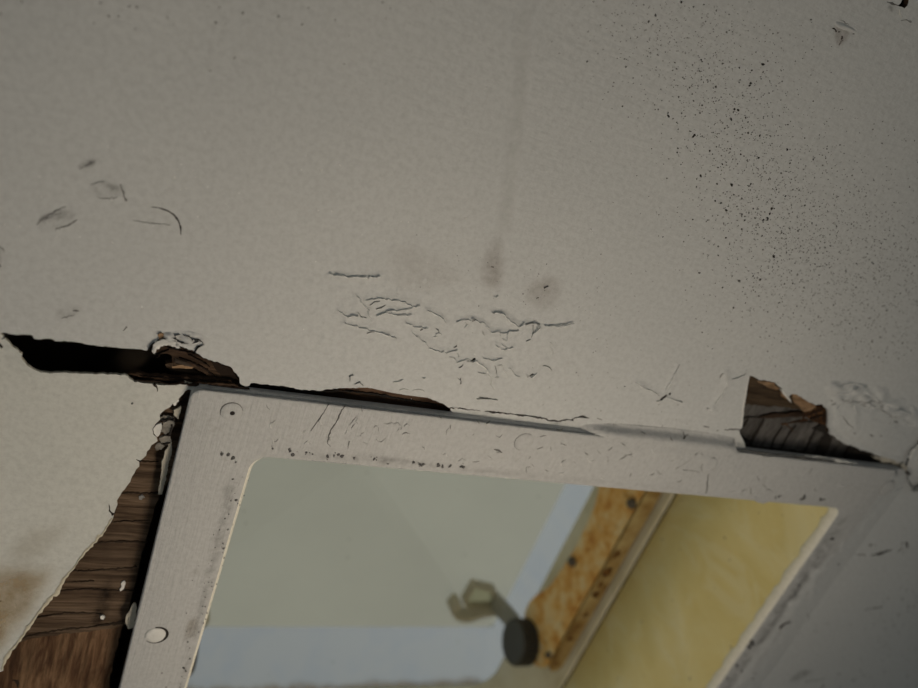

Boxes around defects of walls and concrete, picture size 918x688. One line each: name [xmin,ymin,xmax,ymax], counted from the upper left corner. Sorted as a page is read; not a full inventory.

leakage [600,0,918,365]
peeling [0,333,194,672]
crack [139,346,714,493]
peeling [792,394,816,412]
peeling [801,454,858,464]